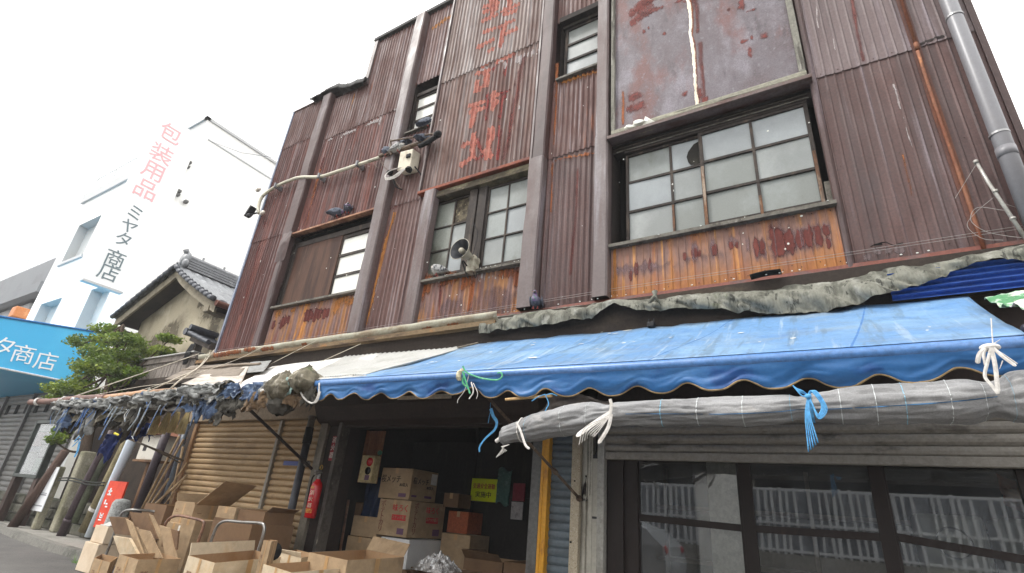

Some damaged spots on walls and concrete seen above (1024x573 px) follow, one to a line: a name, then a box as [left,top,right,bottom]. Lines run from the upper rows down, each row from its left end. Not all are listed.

rust [628,0,686,34]
rust [554,63,597,142]
rust [622,91,646,125]
rust [550,152,594,275]
rust [683,223,832,261]
rust [422,272,476,310]
rust [498,268,519,288]
rust [613,249,660,294]
rust [271,296,354,329]